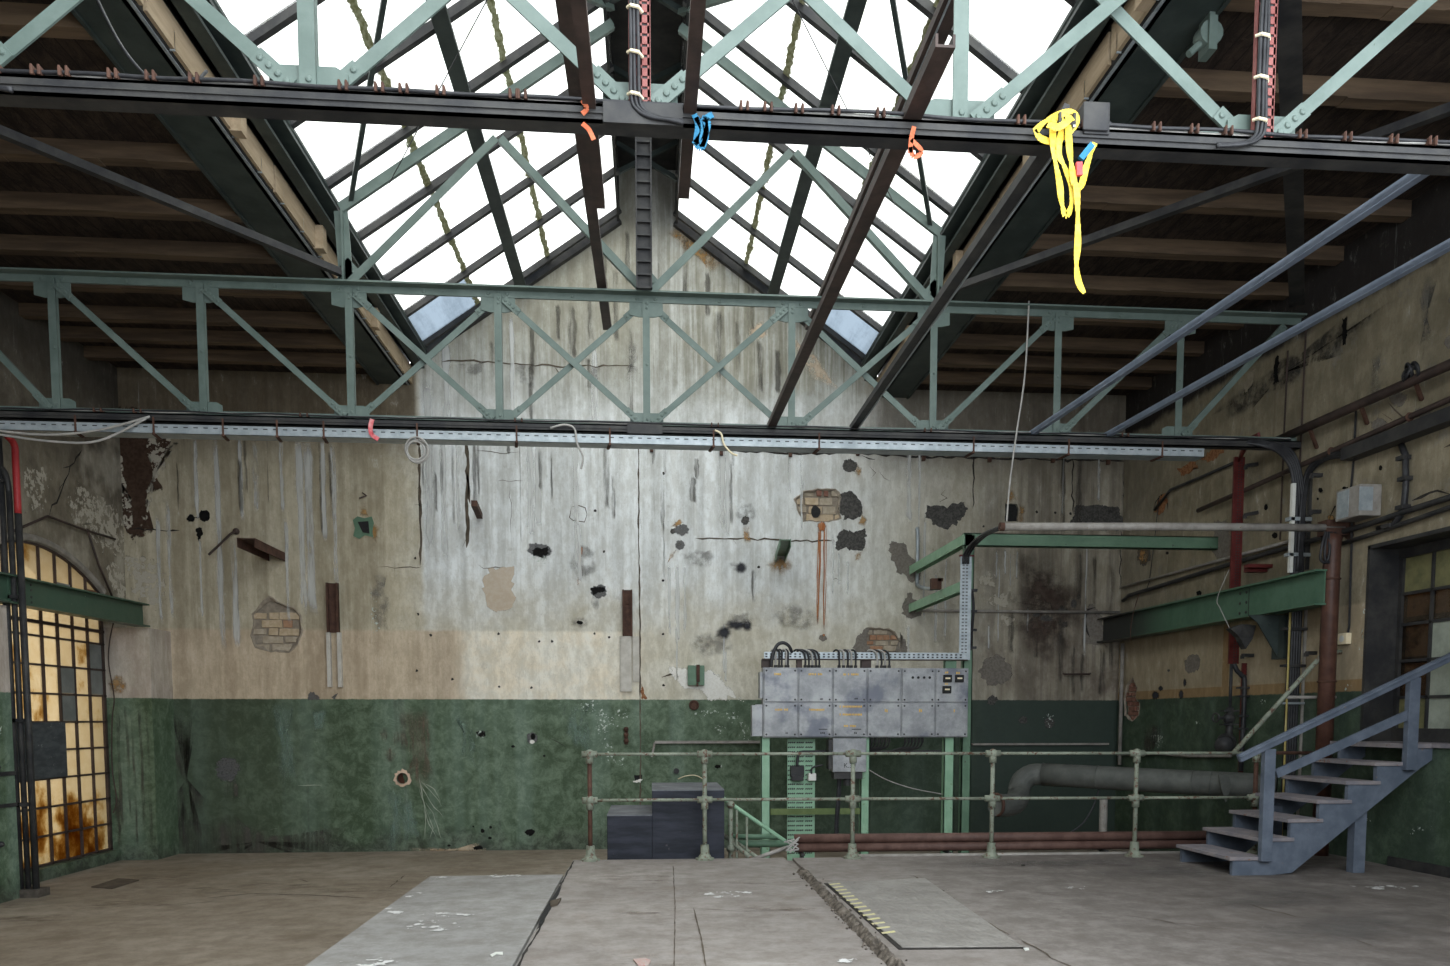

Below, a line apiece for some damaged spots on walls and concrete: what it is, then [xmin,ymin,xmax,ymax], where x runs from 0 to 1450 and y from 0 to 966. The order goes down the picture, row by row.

leakage [510,322,534,419]
spalling [793,488,842,522]
spalling [250,596,303,653]
spalling [527,543,551,564]
spalling [590,584,607,598]
corrosion [816,522,827,641]
spalling [866,627,901,653]
leakage [988,549,1096,683]